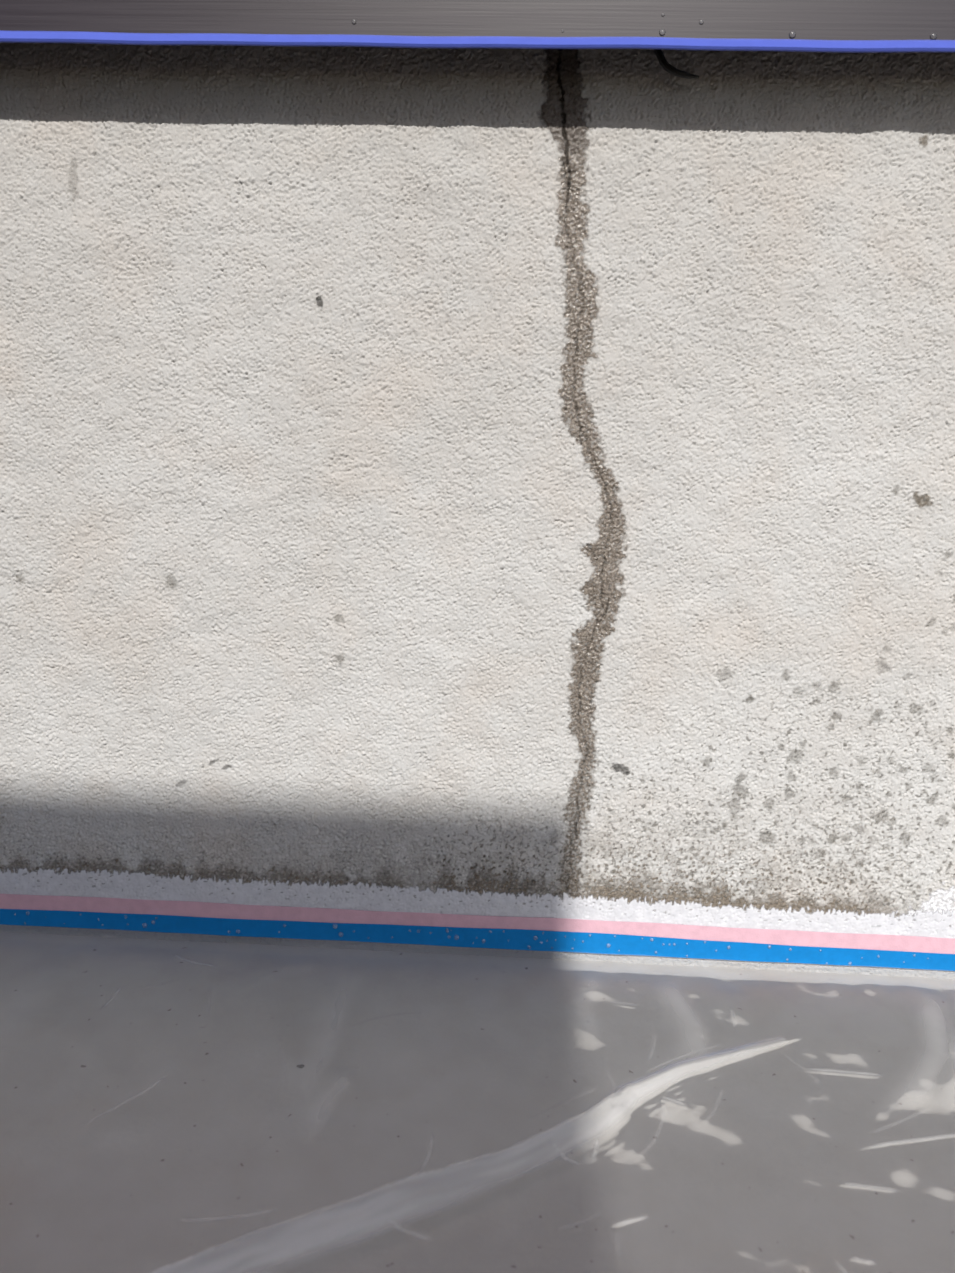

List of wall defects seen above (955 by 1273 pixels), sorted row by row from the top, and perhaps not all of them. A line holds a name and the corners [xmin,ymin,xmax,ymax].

crack [556,49,571,200]
damp [426,49,879,915]